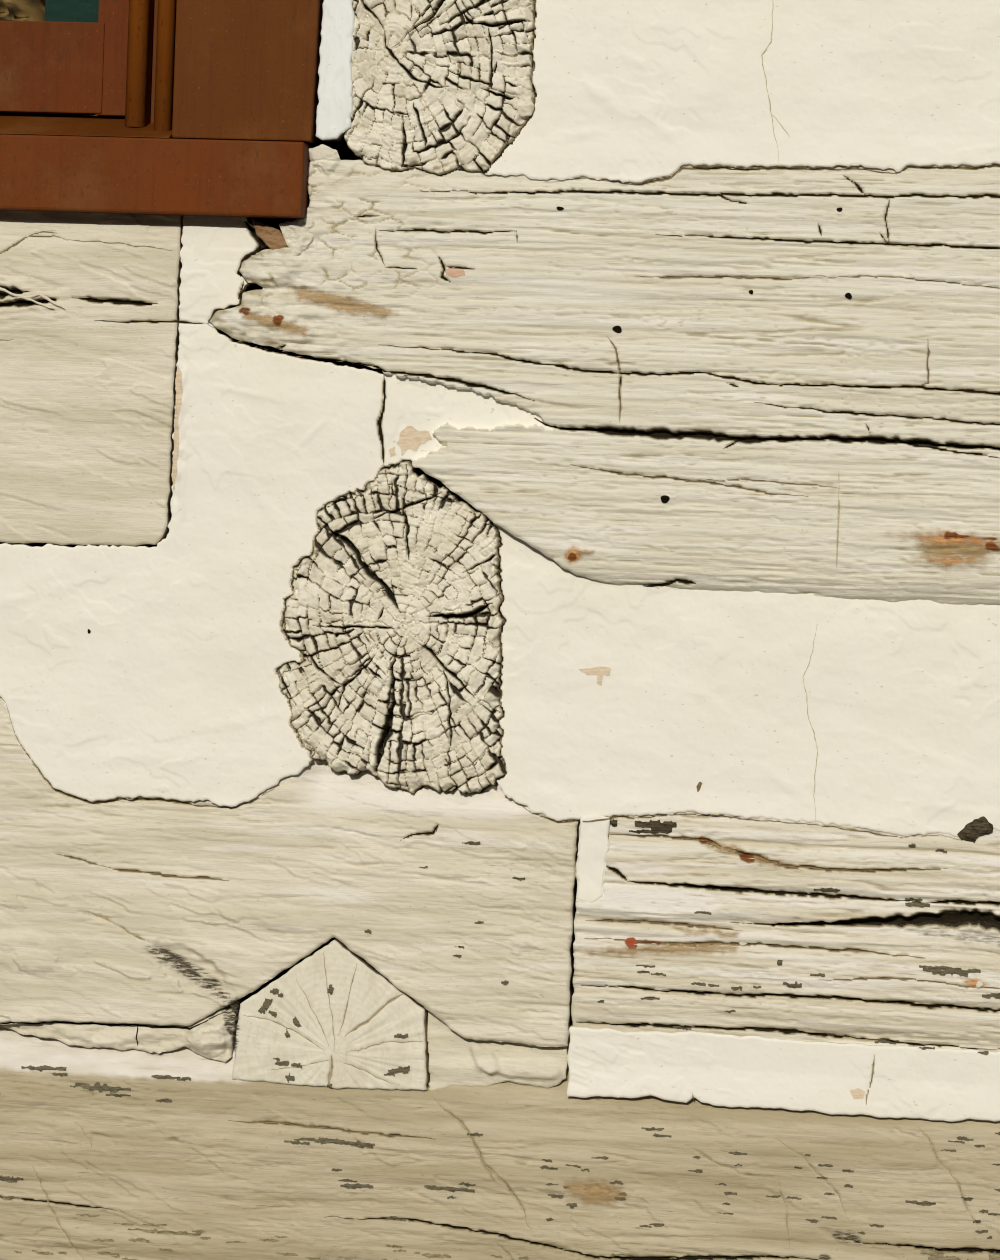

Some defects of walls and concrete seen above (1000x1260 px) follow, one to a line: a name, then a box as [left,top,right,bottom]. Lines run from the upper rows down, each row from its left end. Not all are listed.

crack [362,0,525,167]
crack [420,9,1000,249]
crack [238,221,265,299]
crack [357,215,517,282]
crack [640,275,997,288]
crack [0,287,1000,776]
rust [915,532,1000,567]
crack [506,627,1000,1012]
rust [625,937,660,949]
crack [580,1022,1000,1105]
crack [229,1101,818,1260]
crack [773,1129,1000,1253]